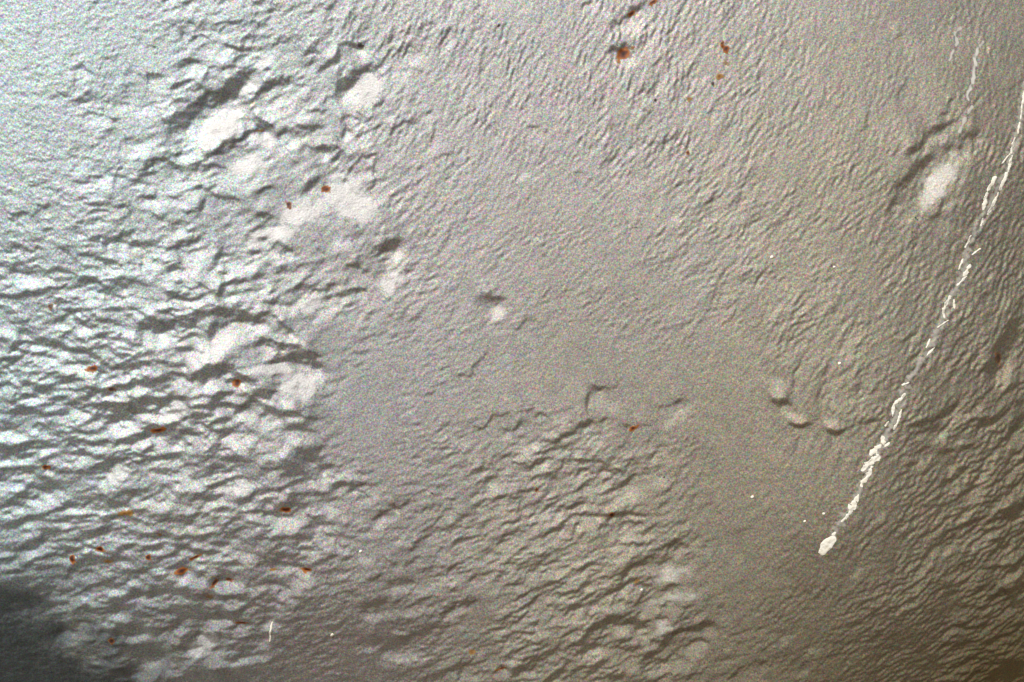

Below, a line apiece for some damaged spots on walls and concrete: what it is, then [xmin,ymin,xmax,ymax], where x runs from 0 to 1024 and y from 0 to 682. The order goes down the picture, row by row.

rust [617,46,634,63]